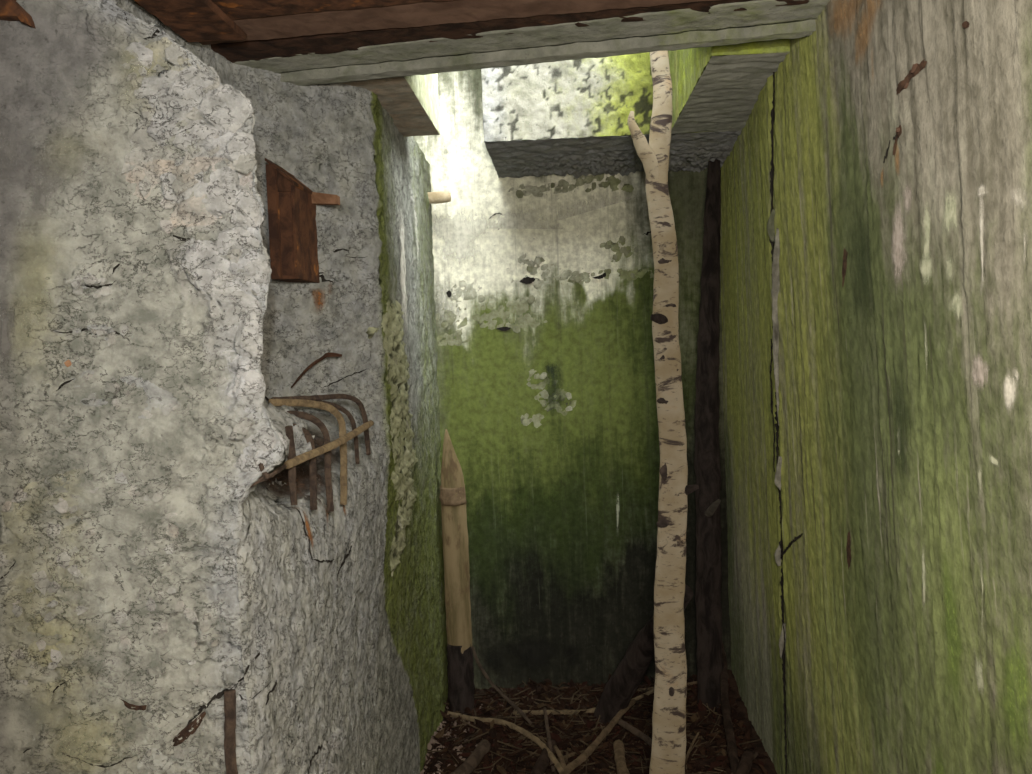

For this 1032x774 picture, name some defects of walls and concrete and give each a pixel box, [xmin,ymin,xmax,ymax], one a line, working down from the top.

crack [768,72,776,214]
spalling [121,37,374,512]
damp [893,190,911,275]
damp [921,209,932,280]
damp [944,195,957,231]
damp [953,295,961,318]
damp [973,358,987,384]
damp [1005,372,1018,405]
spalling [366,299,418,576]
crack [770,326,803,774]